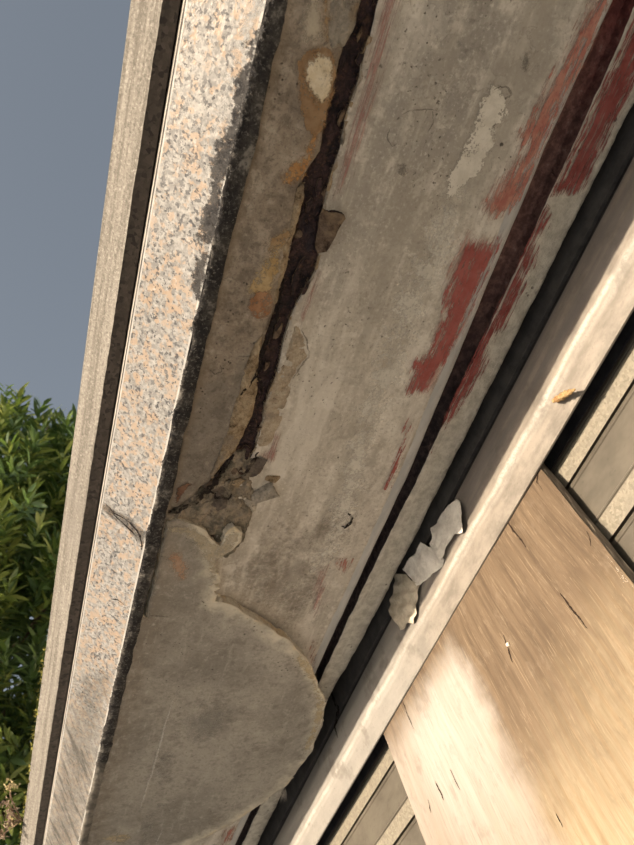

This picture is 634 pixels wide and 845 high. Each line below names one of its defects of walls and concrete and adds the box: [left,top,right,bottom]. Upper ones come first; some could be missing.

peeling [443,0,634,430]
crack [240,279,284,399]
spalling [162,0,395,558]
crack [110,508,143,550]
crack [169,452,259,514]